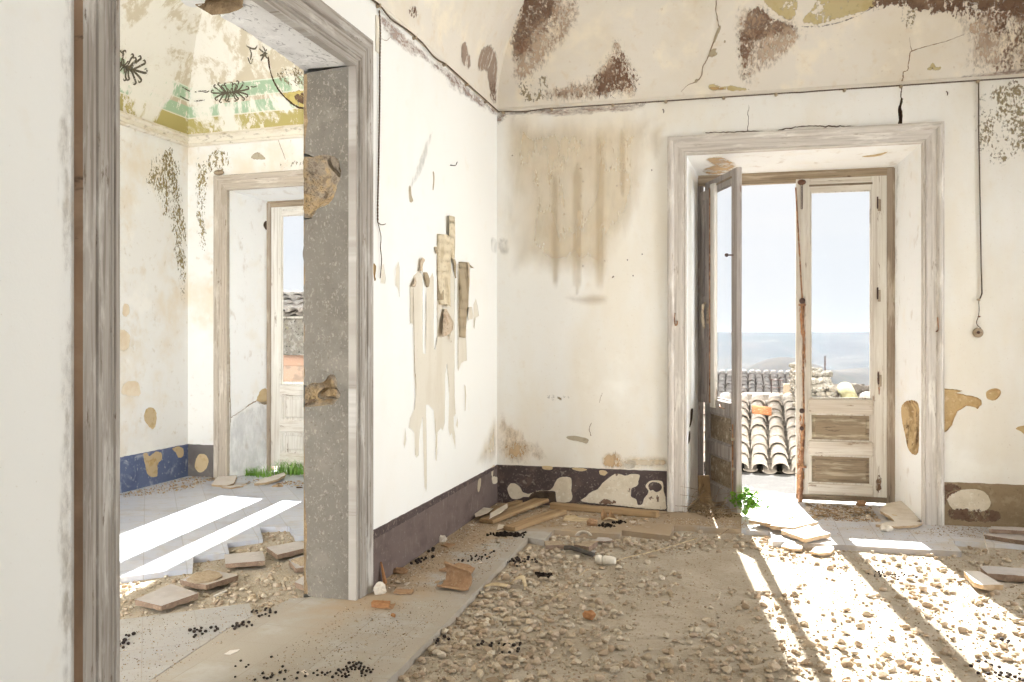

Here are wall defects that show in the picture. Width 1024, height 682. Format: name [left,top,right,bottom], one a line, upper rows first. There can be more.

leakage [512,0,640,101]
crack [681,0,726,92]
leakage [738,6,796,80]
peeling [764,0,875,25]
crack [898,34,964,124]
leakage [146,148,229,296]
peeling [373,215,479,492]
peeling [143,407,157,430]
peeling [143,446,209,478]
peeling [477,465,667,510]
flaking render [901,400,919,455]
flaking render [944,388,1001,432]